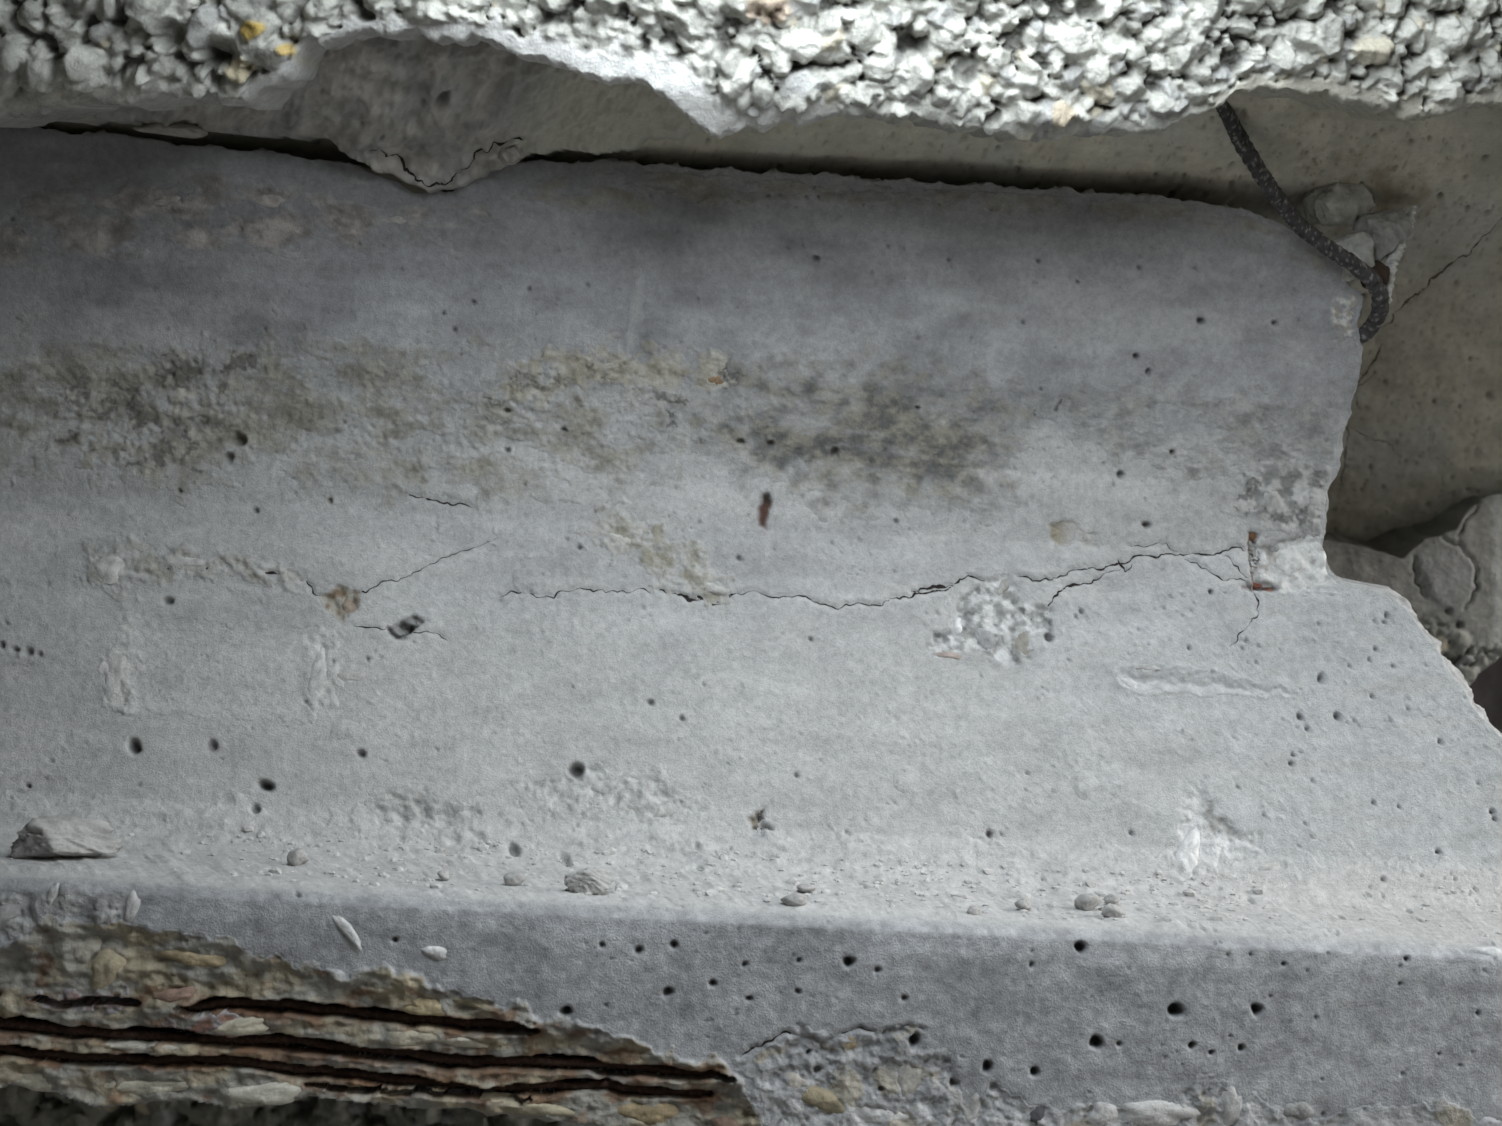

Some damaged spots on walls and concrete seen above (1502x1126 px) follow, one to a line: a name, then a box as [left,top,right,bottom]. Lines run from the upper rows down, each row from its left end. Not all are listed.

rust [1360,261,1390,289]
spalling [1384,205,1417,304]
crack [1341,218,1502,486]
crack [500,575,984,610]
crack [1020,542,1259,646]
rust [36,983,134,1016]
rust [161,1007,255,1038]
spalling [0,880,1502,1126]